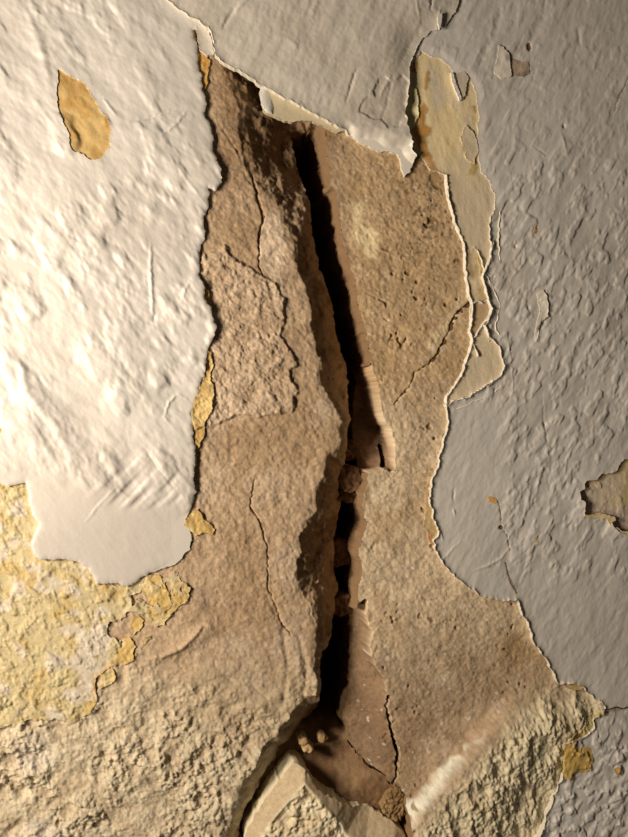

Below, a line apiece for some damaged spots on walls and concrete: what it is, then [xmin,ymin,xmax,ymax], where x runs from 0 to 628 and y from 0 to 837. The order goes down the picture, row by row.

peeling [57,70,111,160]
flaking render [166,0,459,178]
peeling [405,51,503,408]
flaking render [191,350,214,473]
flaking render [184,509,215,536]
crack [378,444,393,471]
flaking render [423,490,438,538]
peeling [580,459,628,537]
peeling [0,483,191,728]
crack [239,646,405,836]
spalling [378,787,406,822]
flaking render [562,744,594,781]